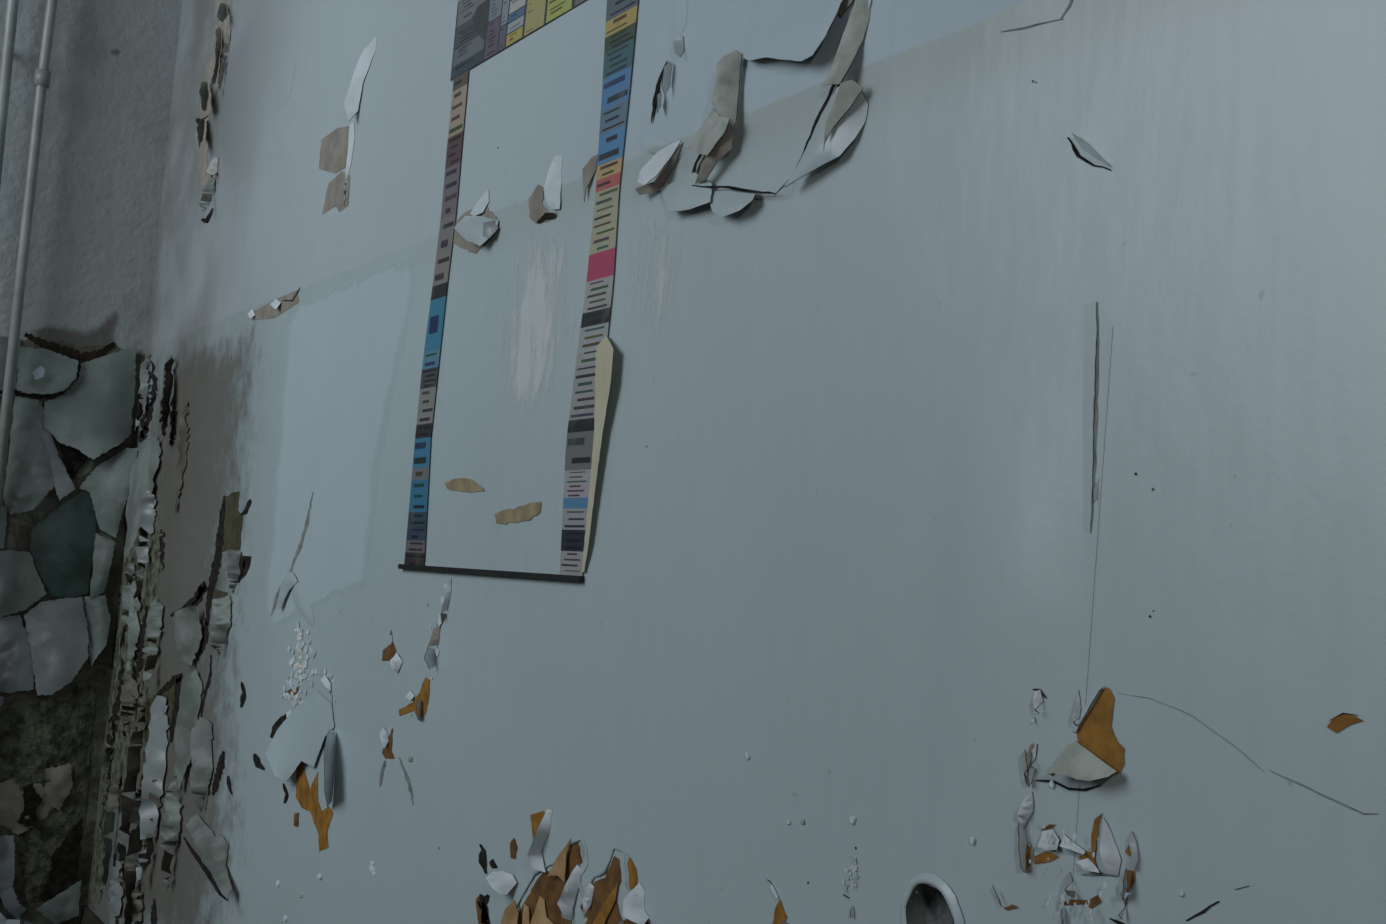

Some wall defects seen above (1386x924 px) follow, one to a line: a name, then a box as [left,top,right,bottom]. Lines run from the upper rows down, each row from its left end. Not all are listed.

peeling [319,35,377,214]
peeling [452,189,499,254]
peeling [635,0,871,217]
peeling [0,337,251,924]
water stain [128,728,215,924]
water stain [147,355,244,747]
peeling [253,492,337,851]
peeling [379,578,452,805]
peeling [476,809,658,924]
spalling [900,873,964,924]
peeling [1017,686,1139,924]
crack [1117,692,1379,814]